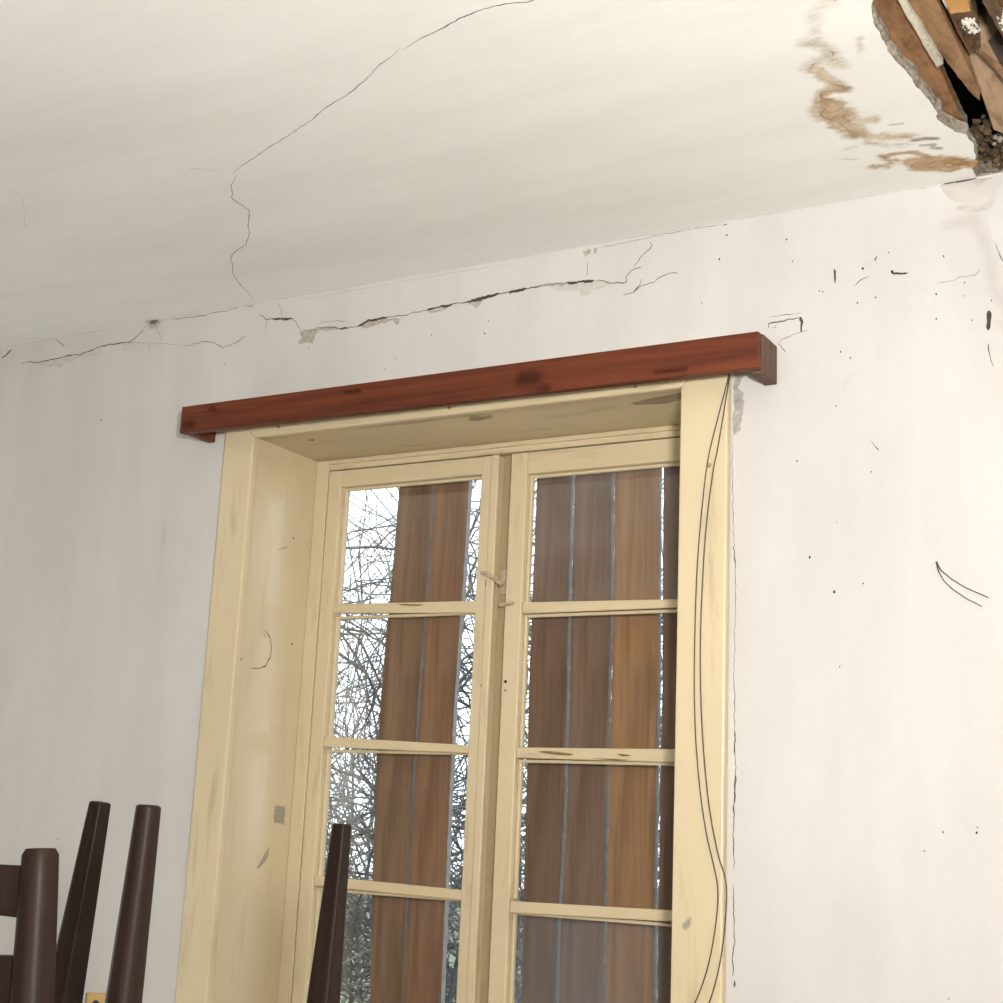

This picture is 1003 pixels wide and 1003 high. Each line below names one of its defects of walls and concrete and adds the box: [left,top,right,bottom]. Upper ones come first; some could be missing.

spalling [872,0,1003,176]
water stain [809,61,978,172]
crack [176,0,726,331]
crack [2,332,245,365]
spalling [298,326,340,349]
spalling [359,318,400,329]
crack [768,313,806,351]